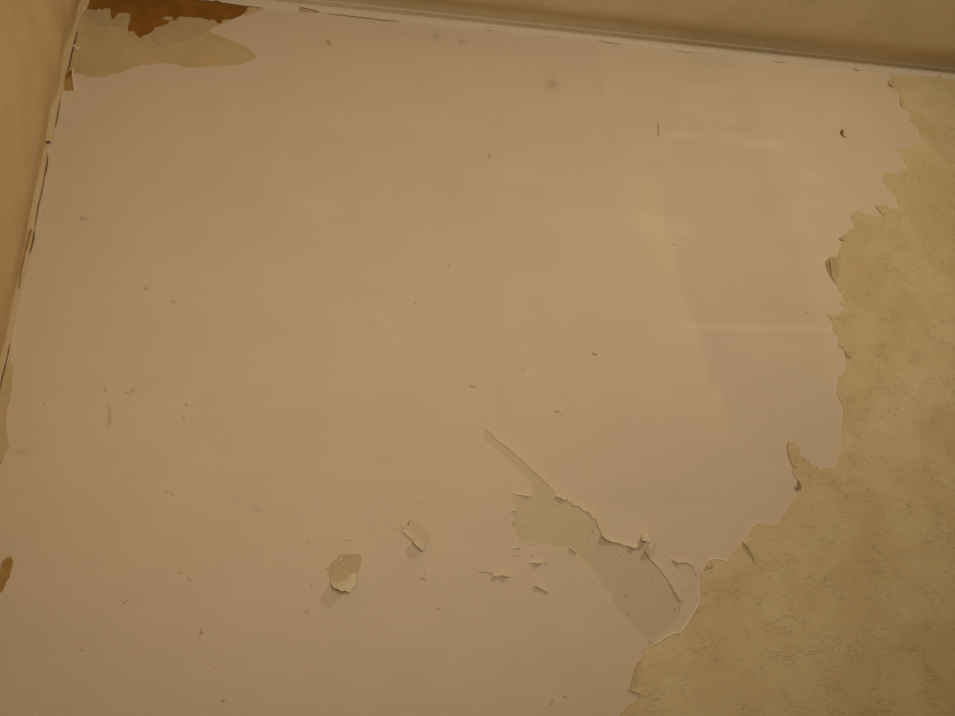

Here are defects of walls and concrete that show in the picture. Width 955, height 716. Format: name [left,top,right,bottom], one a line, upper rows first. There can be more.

peeling [67,0,265,77]
peeling [0,361,14,465]
peeling [0,556,13,593]
peeling [326,554,361,592]